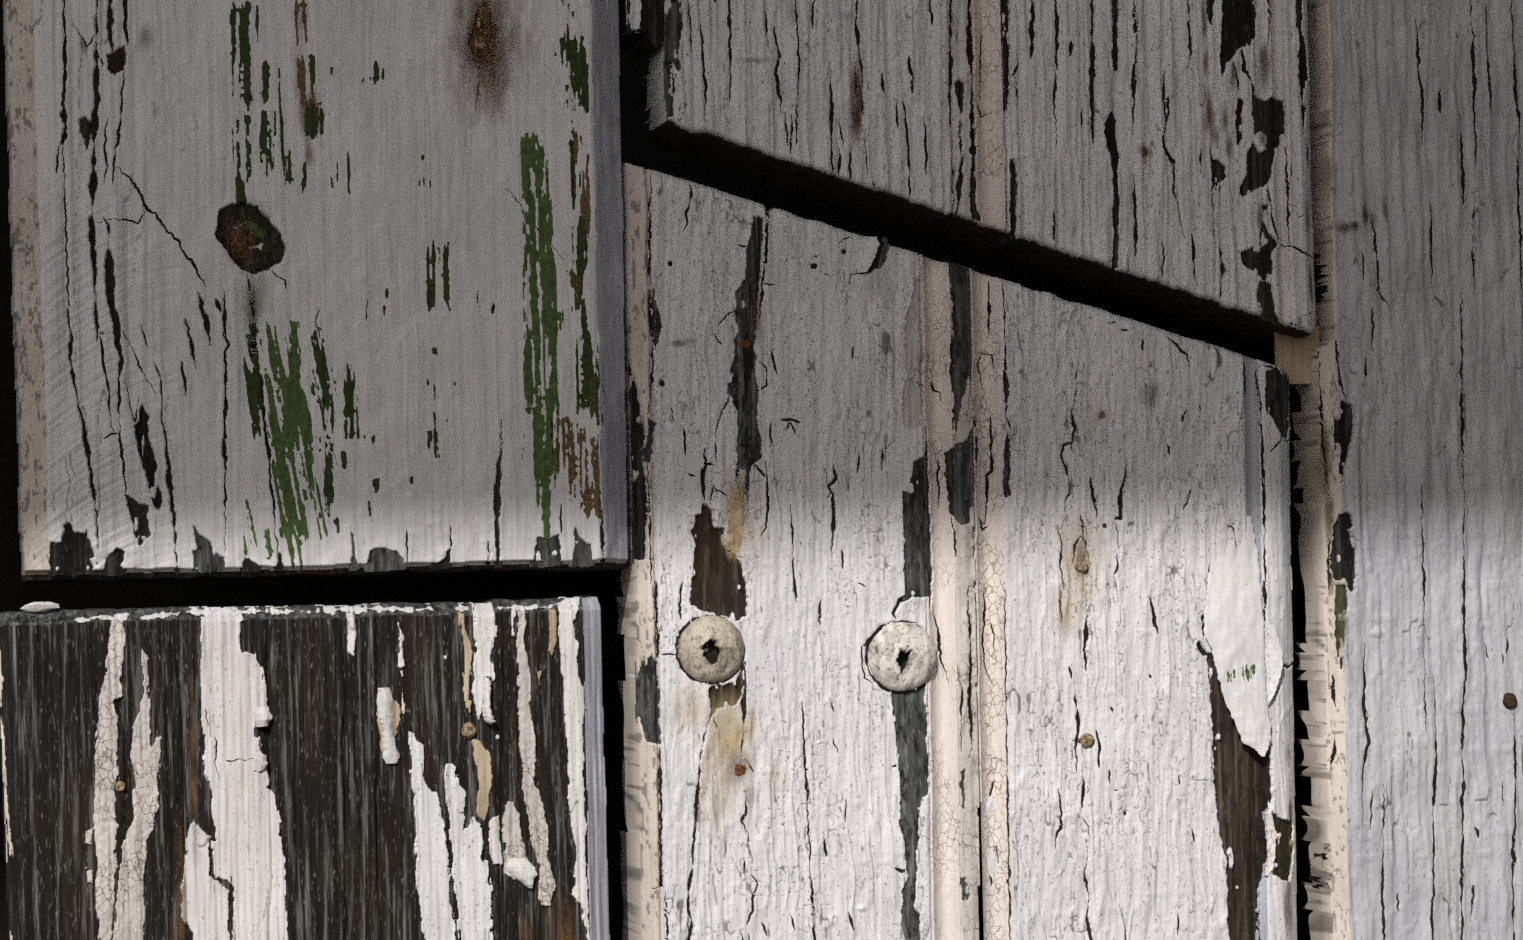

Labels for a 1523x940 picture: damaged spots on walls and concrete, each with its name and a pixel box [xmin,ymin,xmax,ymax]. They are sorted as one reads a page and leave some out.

crack [56,0,287,575]
peeling [216,0,333,274]
peeling [191,300,407,573]
corrosion [469,0,496,64]
peeling [520,0,604,568]
peeling [690,504,747,621]
peeling [1206,0,1308,326]
peeling [84,620,162,940]
peeling [180,607,289,940]
peeling [376,597,591,940]
peeling [891,686,929,940]
peeling [1203,516,1292,940]